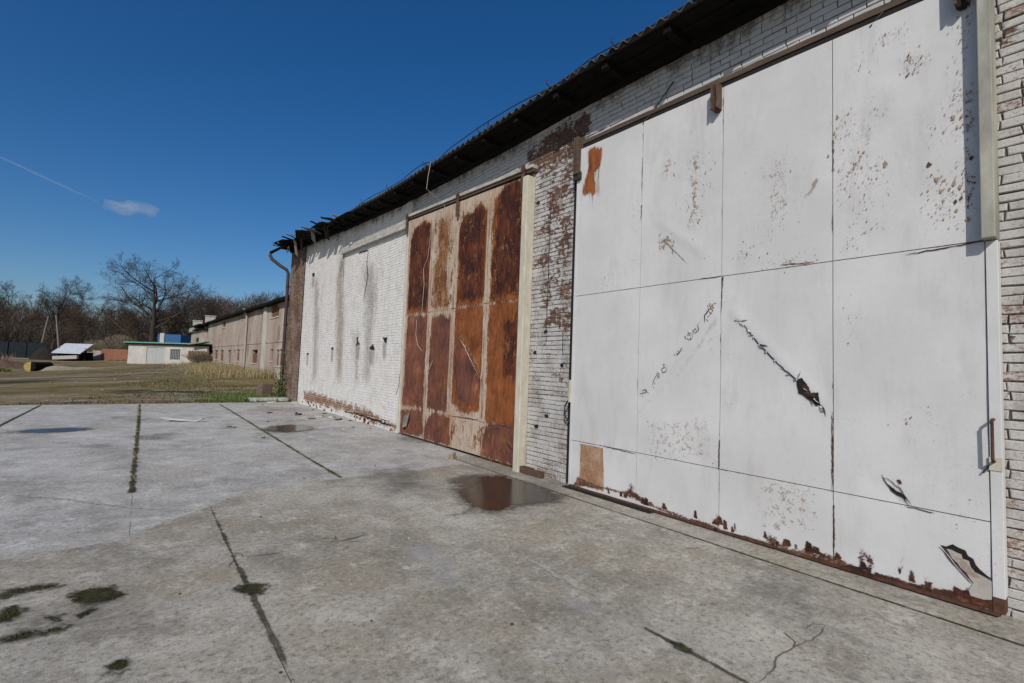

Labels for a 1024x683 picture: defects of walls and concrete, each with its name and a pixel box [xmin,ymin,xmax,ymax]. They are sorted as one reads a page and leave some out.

corrosion [583,147,602,196]
corrosion [400,178,535,470]
crack [736,319,826,416]
spalling [302,391,396,432]
spalling [882,475,912,505]
corrosion [573,443,993,610]
crack [760,623,825,681]